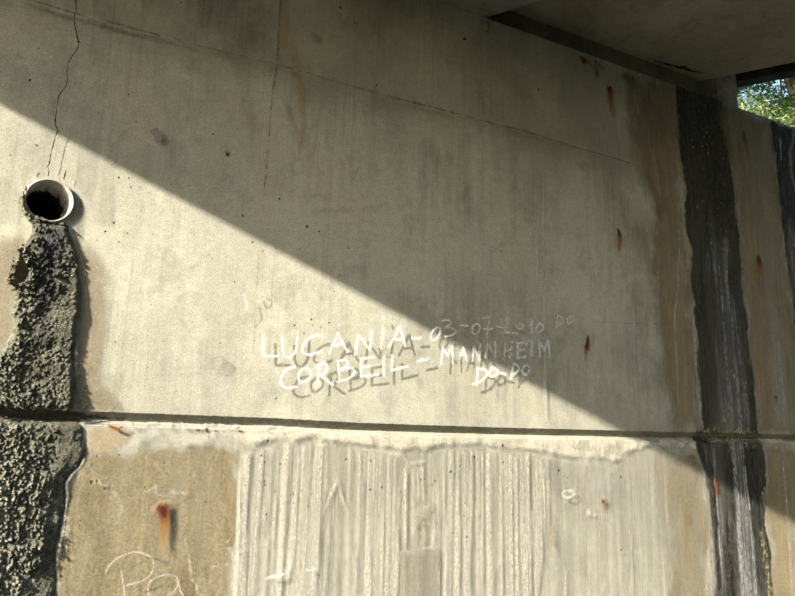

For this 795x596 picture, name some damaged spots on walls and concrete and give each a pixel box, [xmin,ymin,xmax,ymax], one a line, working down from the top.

crack [37,0,80,180]
spalling [7,244,35,292]
leakage [628,84,698,428]
leakage [720,104,795,434]
leakage [0,186,708,596]
corrosion [156,503,170,550]
leakage [762,446,795,596]